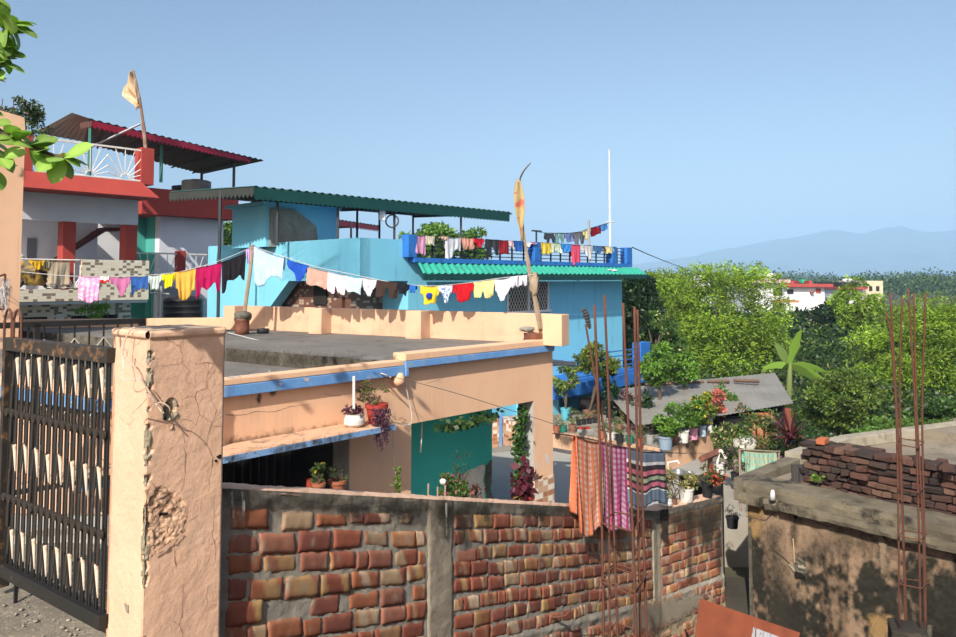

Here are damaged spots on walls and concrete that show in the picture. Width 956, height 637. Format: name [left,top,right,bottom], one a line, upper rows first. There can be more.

crack [131,337,333,634]
spalling [141,504,149,589]
leakage [766,530,793,628]
leakage [808,534,891,573]